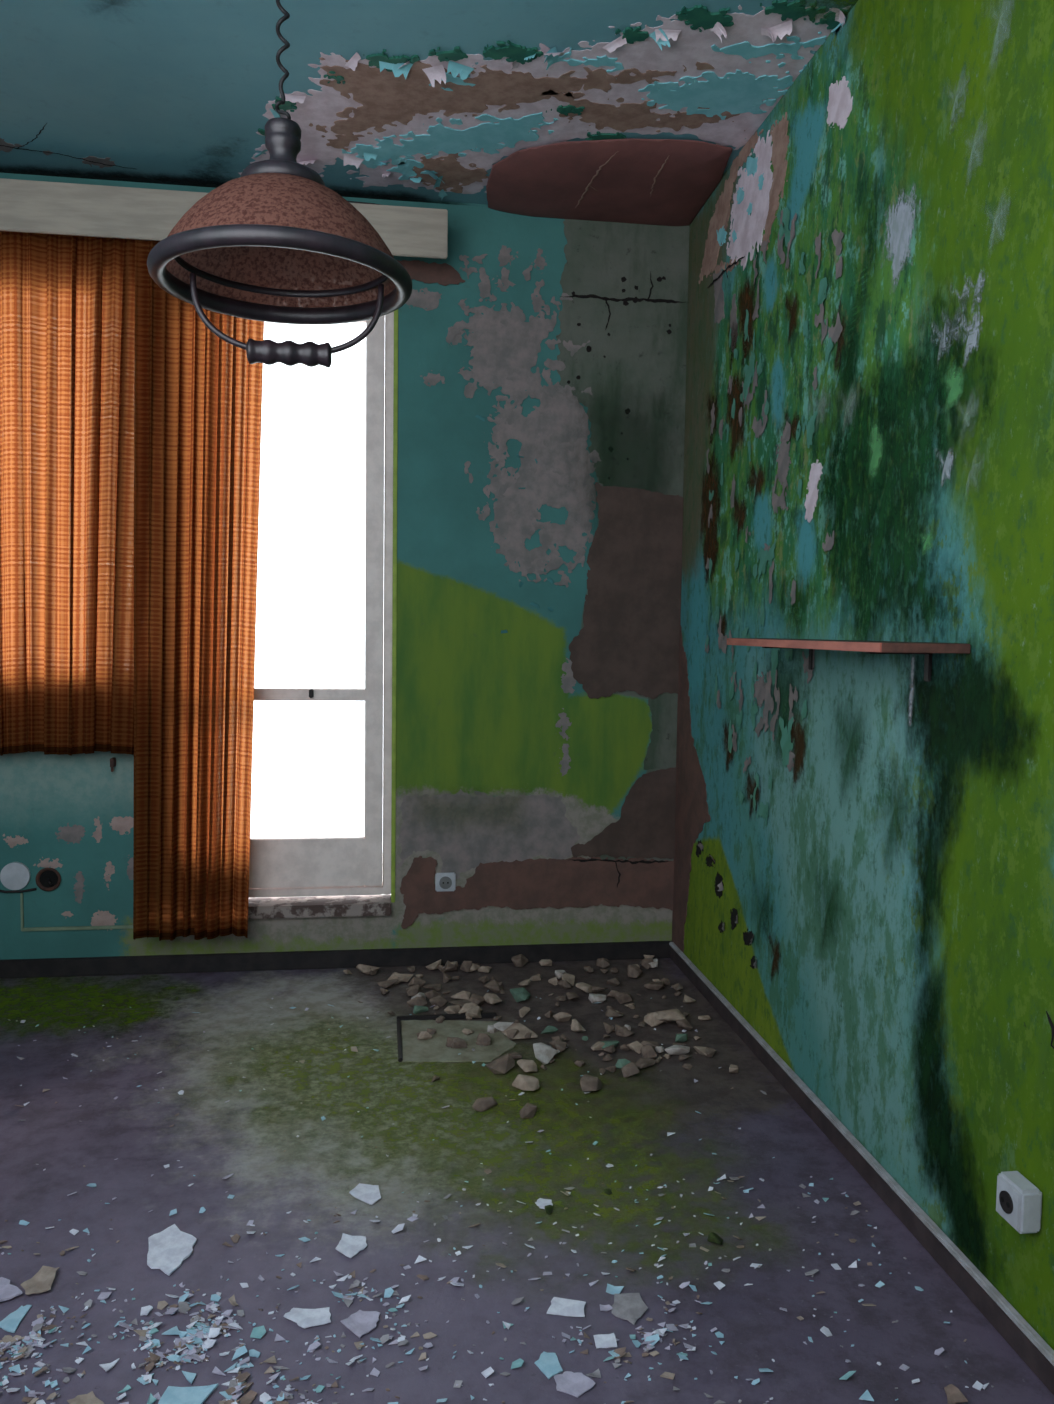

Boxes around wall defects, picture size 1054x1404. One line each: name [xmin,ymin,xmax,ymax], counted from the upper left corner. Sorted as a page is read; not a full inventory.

crack [560,256,745,331]
peeling [239,0,853,969]
damp [772,666,799,751]
damp [817,184,1034,1276]
peeling [3,834,29,848]
peeling [33,857,118,931]
peeling [55,816,134,844]
peeling [104,855,133,890]